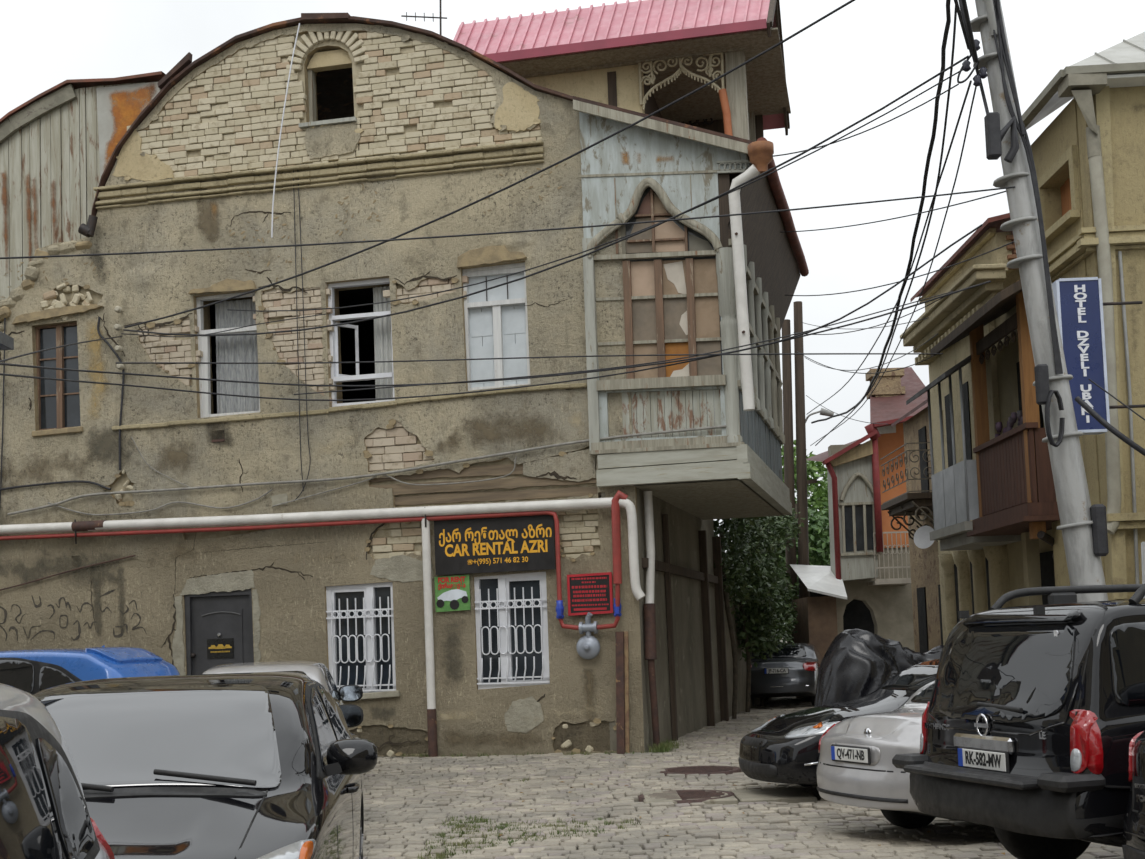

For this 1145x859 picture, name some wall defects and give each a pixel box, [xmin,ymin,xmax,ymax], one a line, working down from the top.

corrosion [106,86,155,164]
spalling [112,25,542,181]
corrosion [26,176,38,261]
spalling [0,240,103,335]
spalling [188,278,336,403]
spalling [363,419,601,562]
crack [161,535,324,664]
spalling [551,718,616,754]